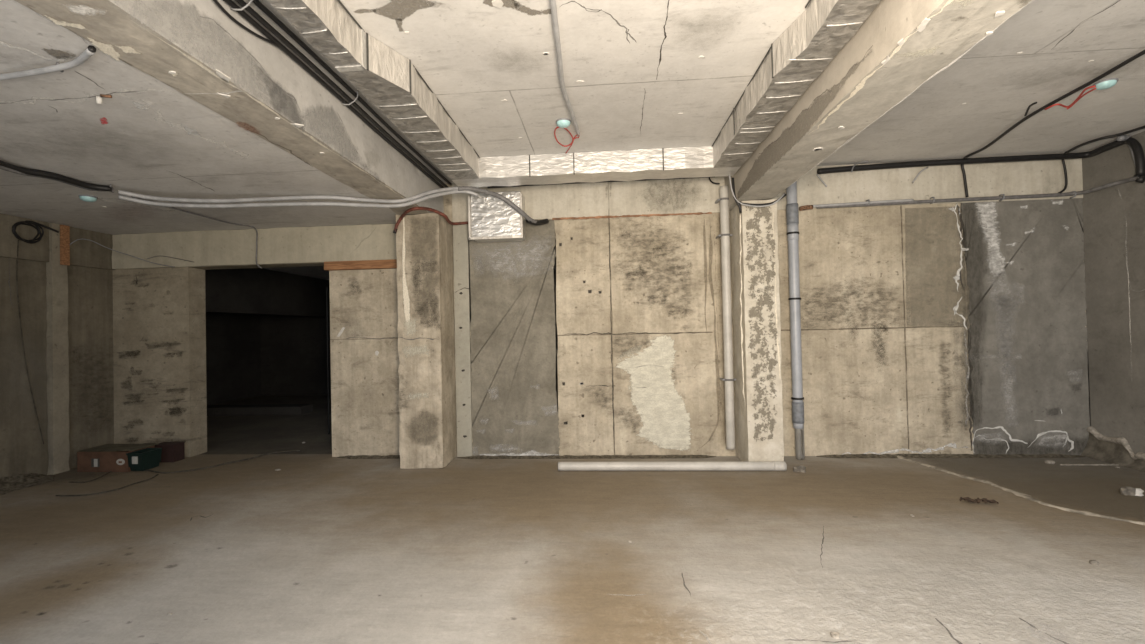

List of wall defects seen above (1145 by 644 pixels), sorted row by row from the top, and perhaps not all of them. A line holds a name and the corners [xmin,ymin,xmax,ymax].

peeling [43,5,141,64]
peeling [131,20,416,206]
spalling [483,0,551,15]
crack [561,0,669,132]
peeling [402,218,437,356]
peeling [740,206,780,441]
spalling [1081,426,1145,472]